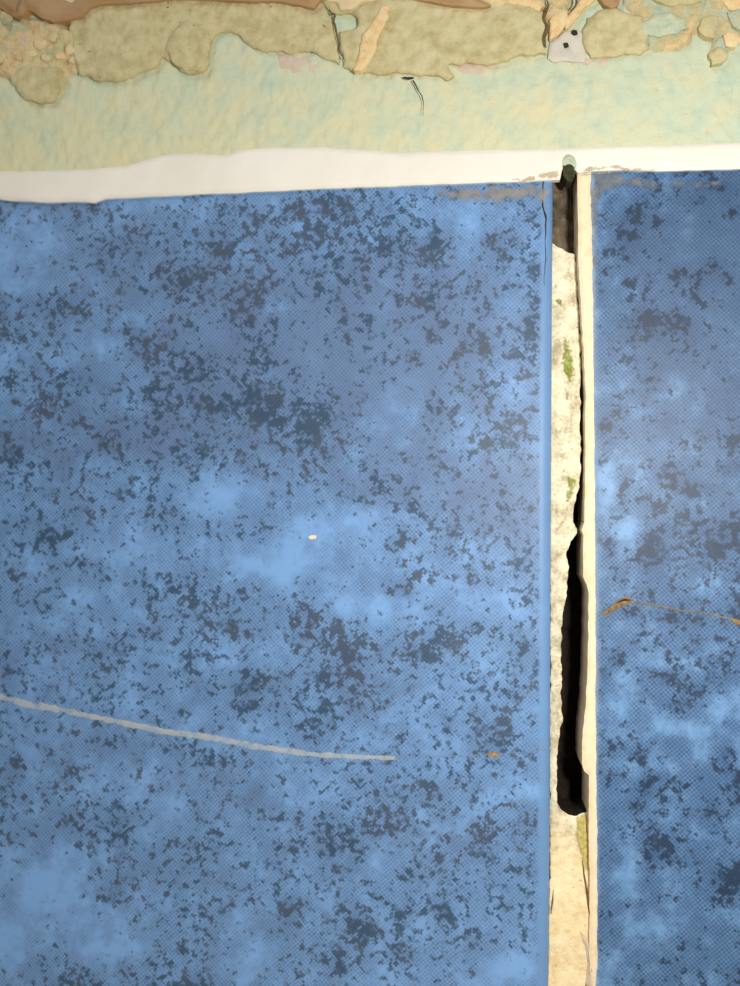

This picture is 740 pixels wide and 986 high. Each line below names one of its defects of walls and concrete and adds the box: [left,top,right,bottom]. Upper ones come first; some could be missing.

flaking render [0,0,740,105]
crack [540,182,548,275]
crack [602,596,740,625]
crack [0,694,548,760]